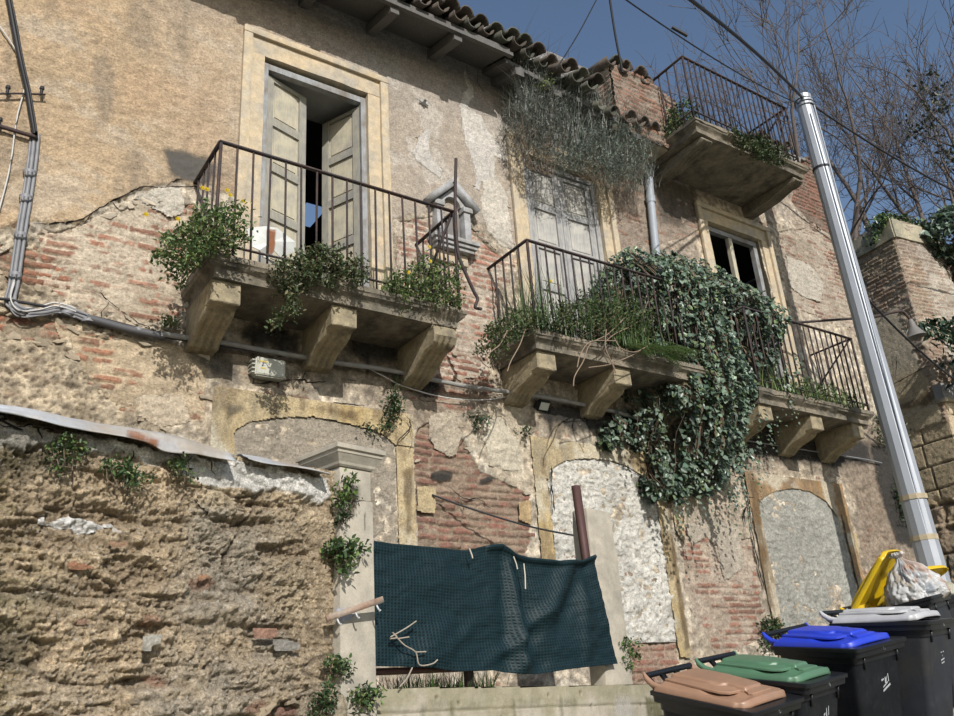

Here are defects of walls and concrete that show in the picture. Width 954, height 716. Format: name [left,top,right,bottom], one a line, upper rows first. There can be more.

crack [33,179,201,225]
flaking render [0,187,213,431]
flaking render [392,70,535,556]
corrosion [129,431,158,445]
flaking render [679,516,769,655]
flaking render [256,698,297,716]
flaking render [327,688,350,716]